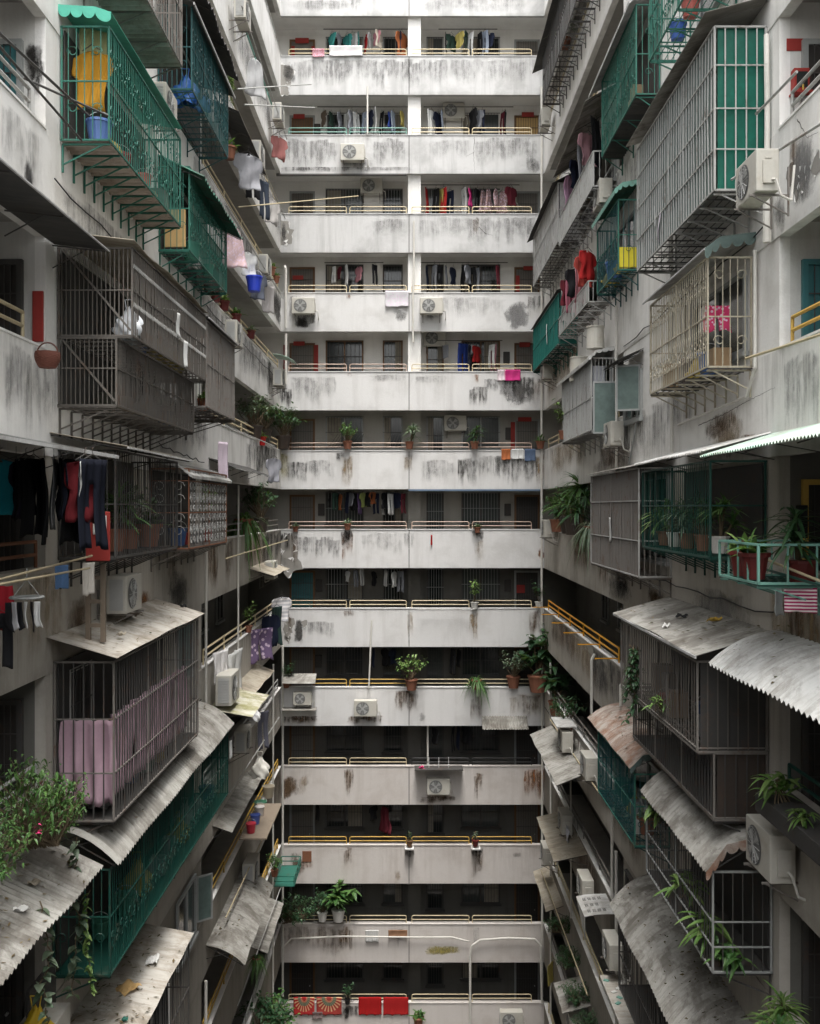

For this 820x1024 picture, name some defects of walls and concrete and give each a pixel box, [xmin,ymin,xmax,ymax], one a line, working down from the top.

leakage [505,303,528,328]
leakage [470,377,534,405]
leakage [458,460,476,478]
leakage [245,532,352,560]
leakage [287,620,322,641]
rust [281,778,296,799]
rust [524,770,544,792]